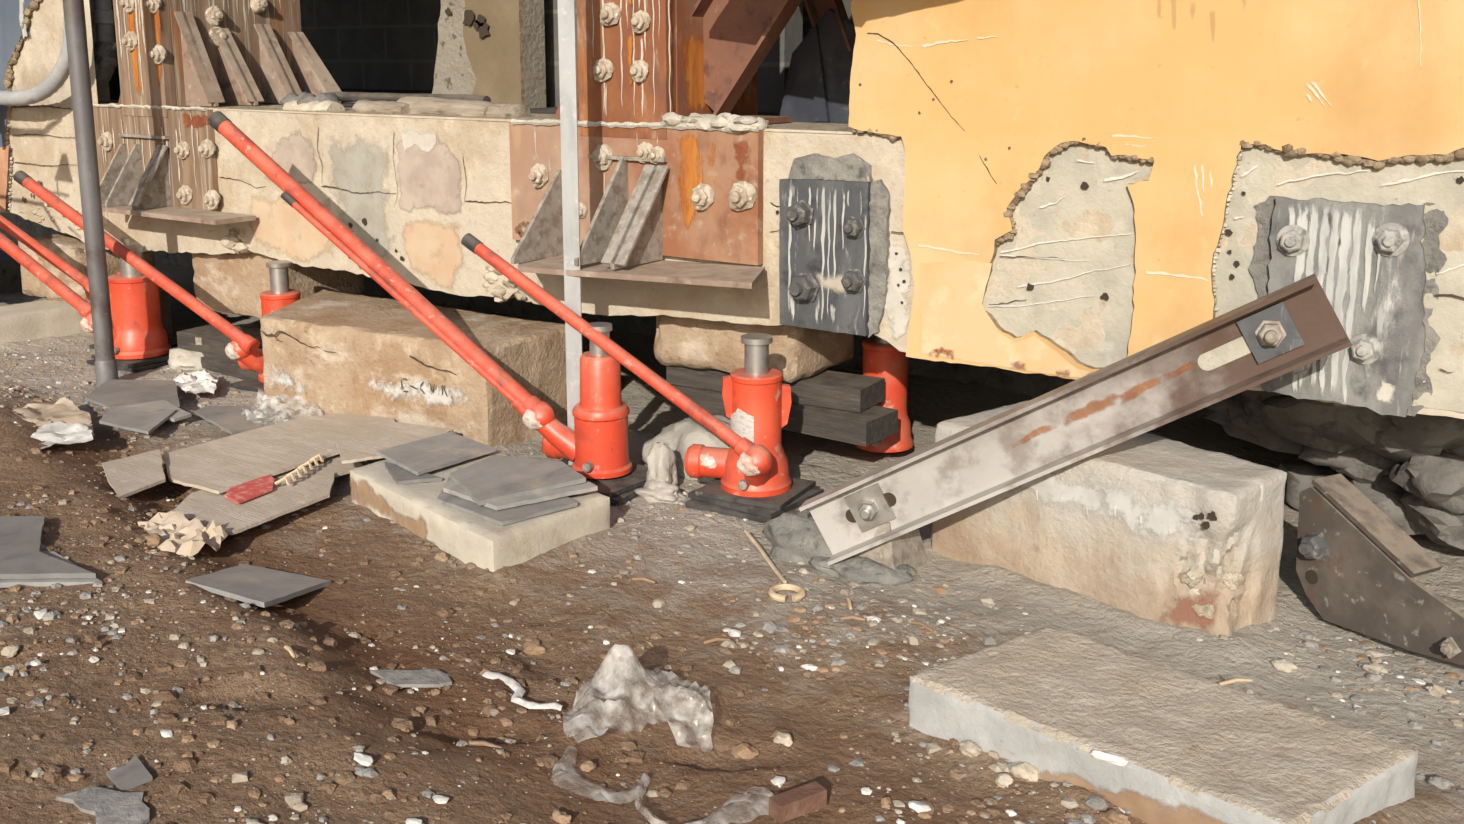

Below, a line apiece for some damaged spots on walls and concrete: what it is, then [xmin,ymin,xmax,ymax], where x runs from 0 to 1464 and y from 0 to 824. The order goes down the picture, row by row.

spalling [3,0,82,230]
spalling [84,0,98,104]
corrosion [128,9,162,94]
peeling [266,130,463,288]
corrosion [682,34,709,111]
corrosion [678,134,716,228]
corrosion [734,141,749,182]
damp [788,188,867,321]
spalling [982,137,1154,367]
spalling [1212,140,1464,318]
damp [1280,204,1399,402]
spalling [1412,250,1464,414]